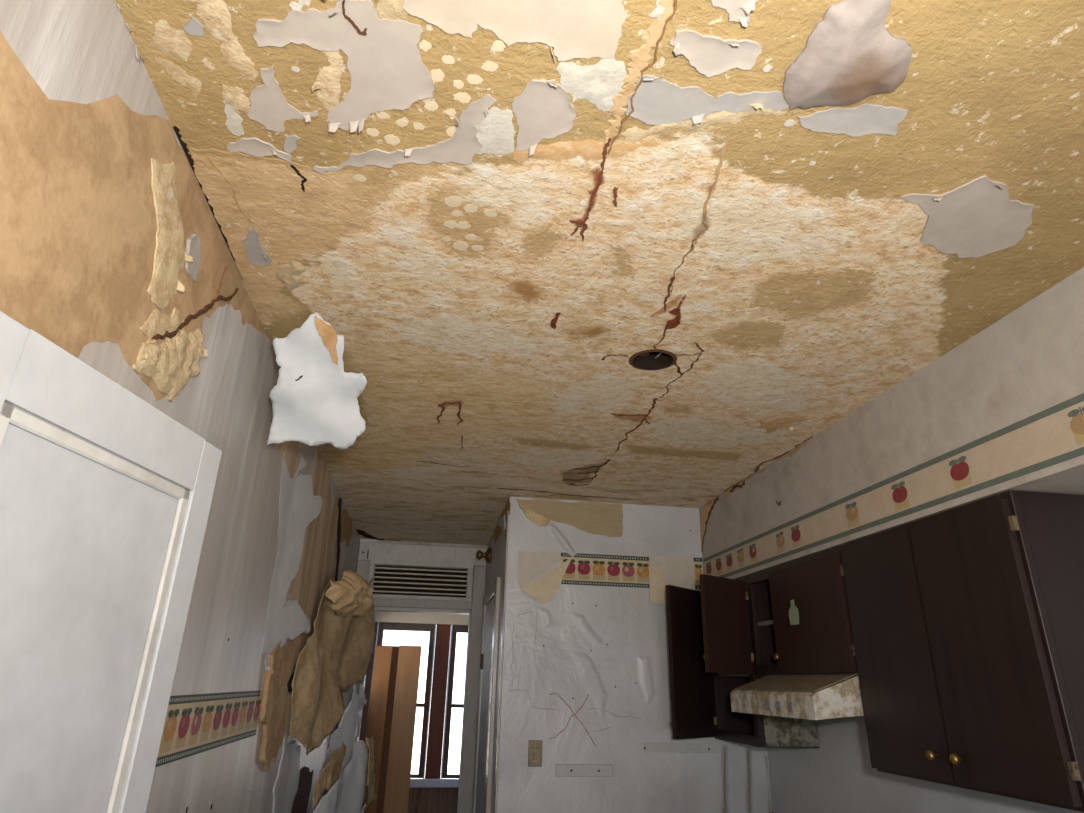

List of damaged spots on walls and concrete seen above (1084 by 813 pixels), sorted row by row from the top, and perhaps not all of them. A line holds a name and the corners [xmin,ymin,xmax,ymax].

peeling [117,0,908,174]
crack [603,0,677,155]
flaking render [0,30,268,402]
crack [151,126,312,340]
flaking render [243,226,308,292]
crack [671,145,727,292]
peeling [900,175,1035,258]
crack [654,328,705,398]
flaking render [273,441,301,479]
flaking render [286,448,353,675]